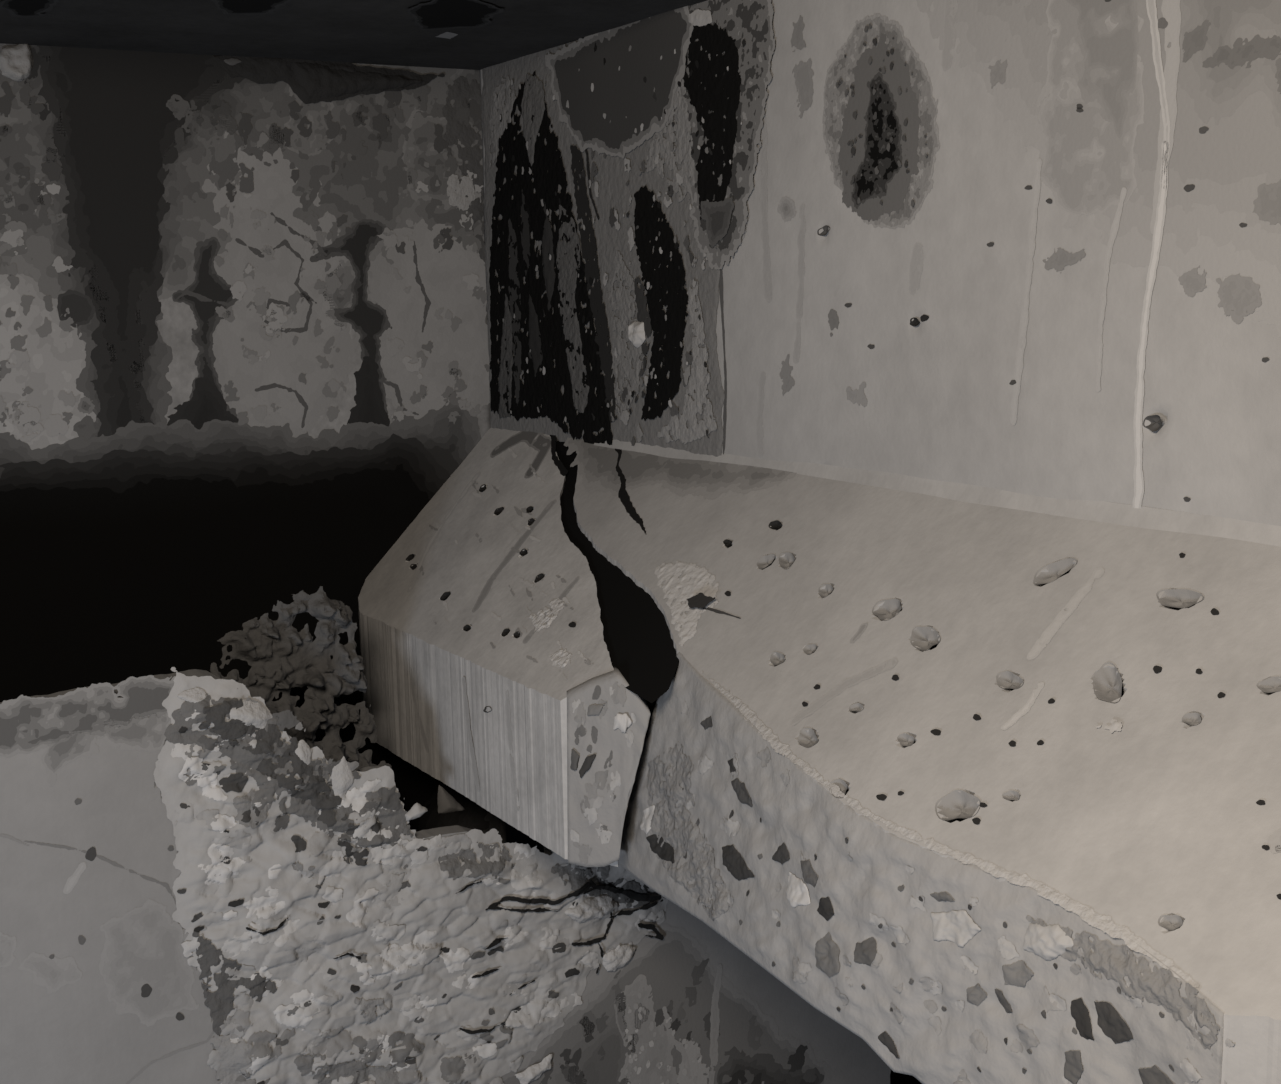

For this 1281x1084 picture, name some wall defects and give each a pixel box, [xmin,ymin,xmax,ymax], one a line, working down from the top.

leakage [407,0,504,30]
crack [175,212,327,333]
crack [413,241,431,332]
leakage [492,0,806,500]
leakage [791,0,1281,509]
leakage [0,43,499,787]
crack [255,383,308,428]
leakage [474,502,577,621]
crack [550,435,679,703]
leakage [314,677,490,832]
spalling [153,558,1235,1084]
crack [456,880,664,1034]